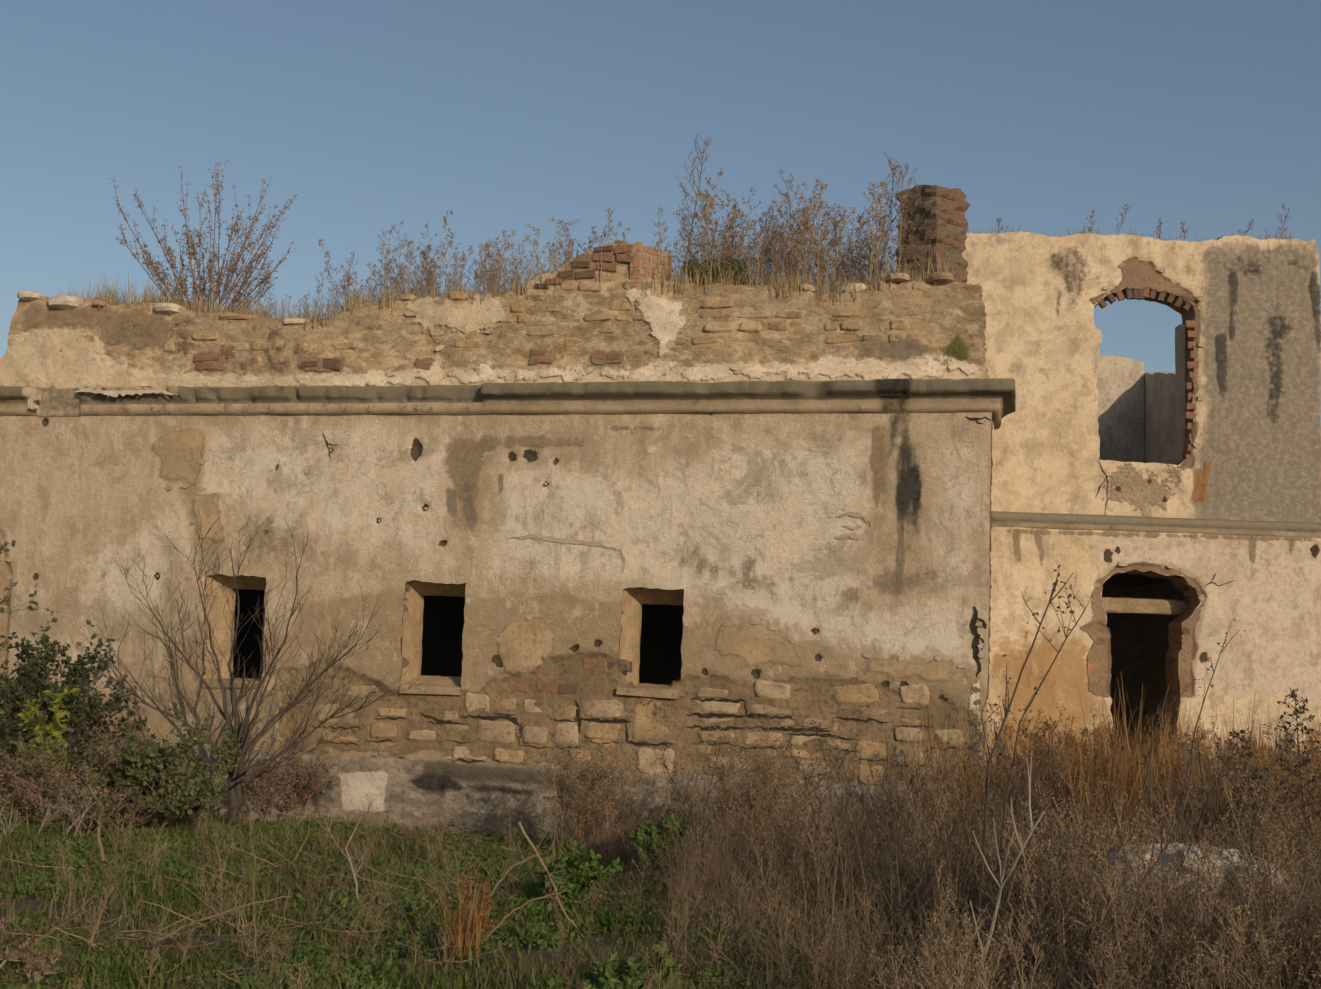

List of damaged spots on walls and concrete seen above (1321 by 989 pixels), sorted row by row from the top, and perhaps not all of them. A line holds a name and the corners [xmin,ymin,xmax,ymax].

flaking render [297,356,344,372]
flaking render [414,329,445,370]
flaking render [585,350,624,374]
flaking render [1090,257,1206,517]
water stain [1216,258,1260,392]
water stain [1268,317,1291,416]
water stain [1311,273,1321,343]
water stain [871,378,922,593]
spalling [496,615,632,695]
crack [970,606,987,678]
flaking render [1080,561,1207,698]
spalling [967,679,982,790]